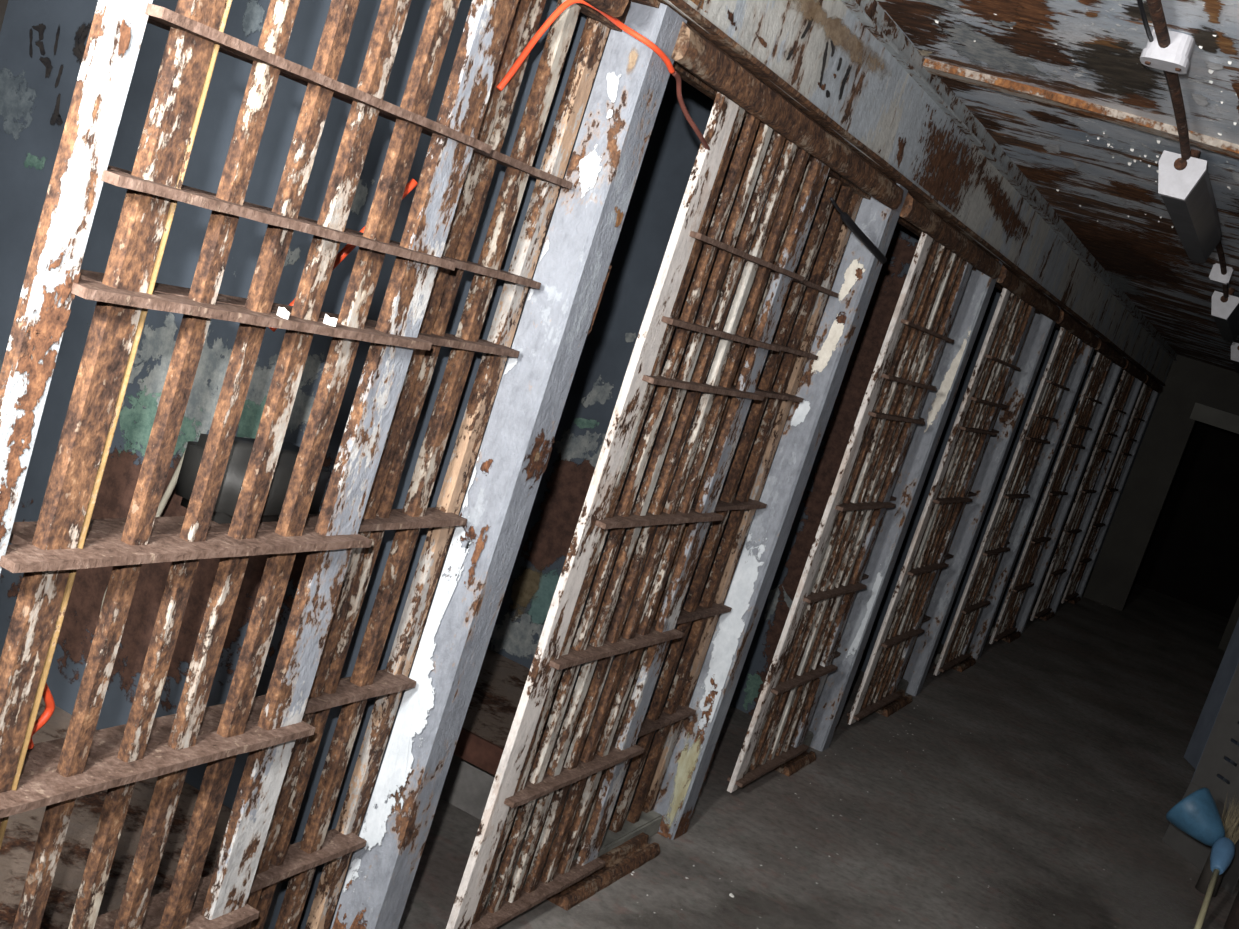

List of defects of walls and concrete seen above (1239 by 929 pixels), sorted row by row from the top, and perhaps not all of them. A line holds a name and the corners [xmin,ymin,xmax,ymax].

peeling [606,72,622,119]
peeling [919,0,1059,80]
peeling [579,143,602,198]
rust [0,249,81,542]
rust [91,446,143,520]
peeling [554,374,614,469]
rust [743,224,920,716]
rust [57,566,113,683]
rust [107,562,172,703]
rust [160,558,221,712]
peeling [343,450,481,892]
peeling [489,612,544,659]